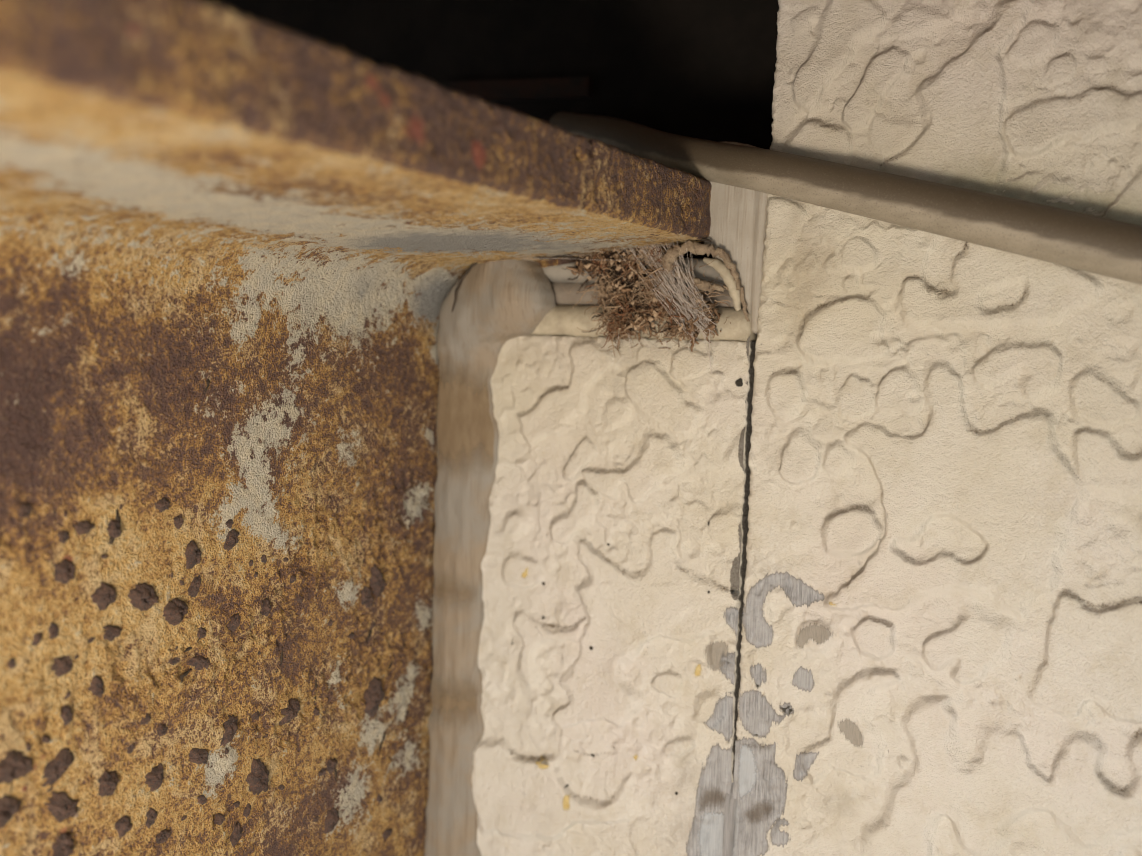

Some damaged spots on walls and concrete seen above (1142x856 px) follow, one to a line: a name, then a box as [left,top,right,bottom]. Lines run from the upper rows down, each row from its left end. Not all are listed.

rust [53,504,123,544]
rust [54,558,76,584]
rust [90,540,202,626]
peeling [796,624,831,648]
rust [51,655,79,677]
peeling [686,524,824,856]
rust [189,711,260,765]
rust [0,735,78,856]
rust [97,770,119,797]
rust [145,763,164,792]
rust [213,758,284,847]
rust [115,808,171,844]